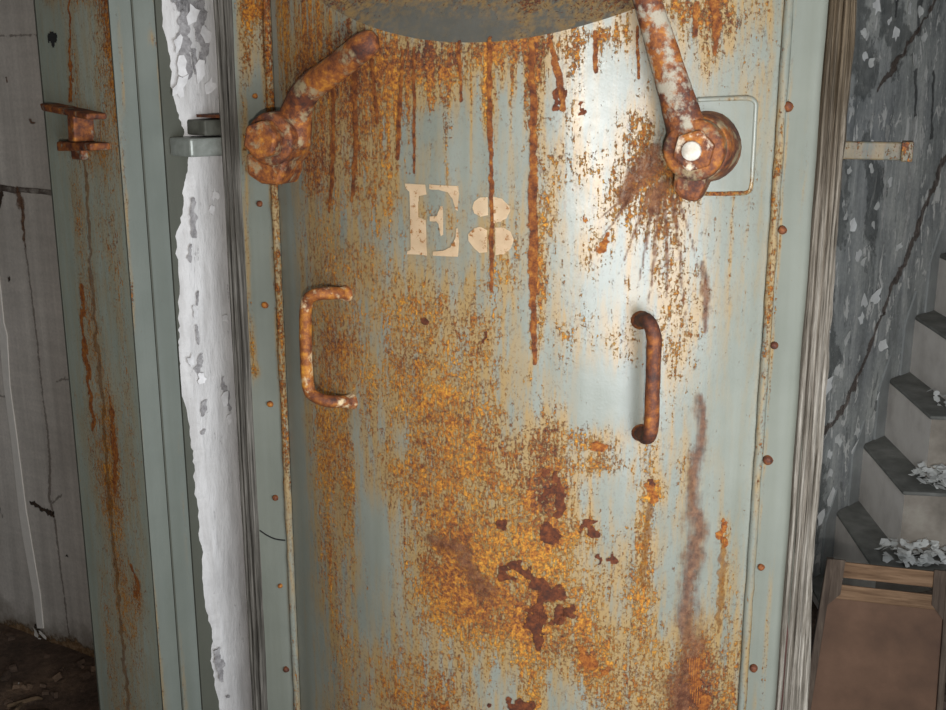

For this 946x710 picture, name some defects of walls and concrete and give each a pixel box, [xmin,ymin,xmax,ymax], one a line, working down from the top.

flaking render [162,0,219,137]
rust [395,46,416,174]
rust [548,38,567,112]
rust [486,36,495,293]
rust [526,38,540,365]
rust [595,232,610,254]
flaking render [175,156,253,710]
crack [30,501,55,517]
rust [537,467,567,553]
rust [579,519,601,538]
rust [498,560,578,651]
rust [506,697,536,710]